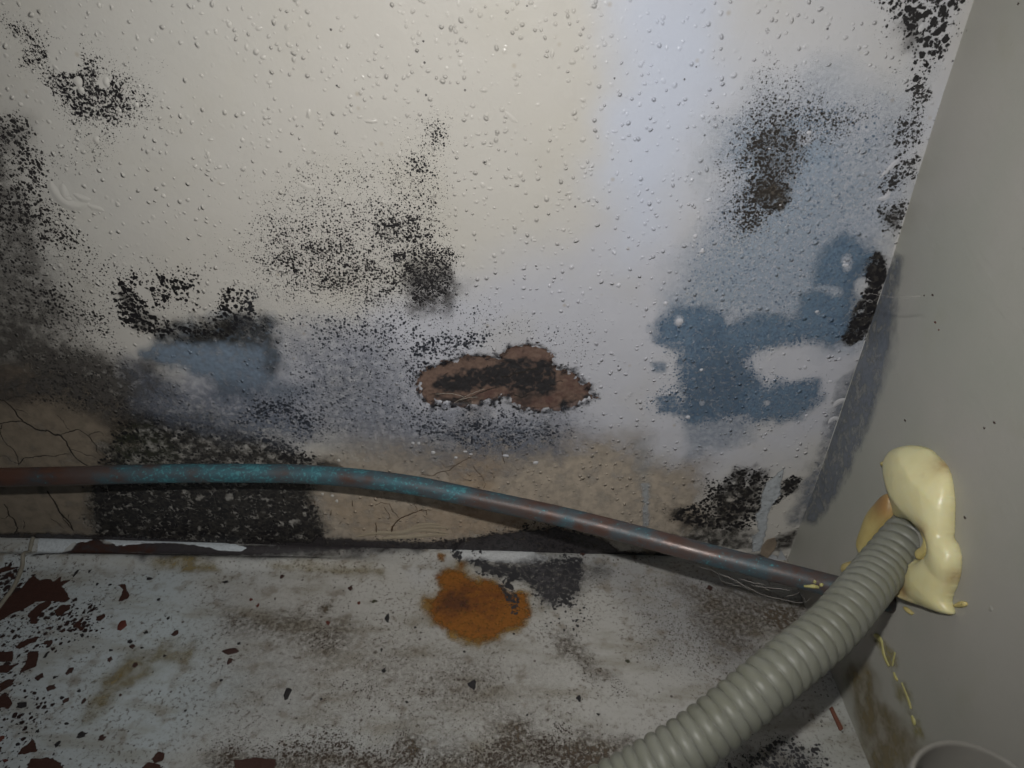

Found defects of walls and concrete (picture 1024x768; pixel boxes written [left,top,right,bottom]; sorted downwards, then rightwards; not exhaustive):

water stain [0,0,966,558]
spalling [415,342,599,419]
crack [0,384,104,466]
crack [47,491,74,531]
spalling [118,584,130,601]
water stain [0,483,671,639]
rust [422,554,530,645]
spalling [0,576,71,709]
spalling [17,738,63,768]
spalling [142,751,165,768]